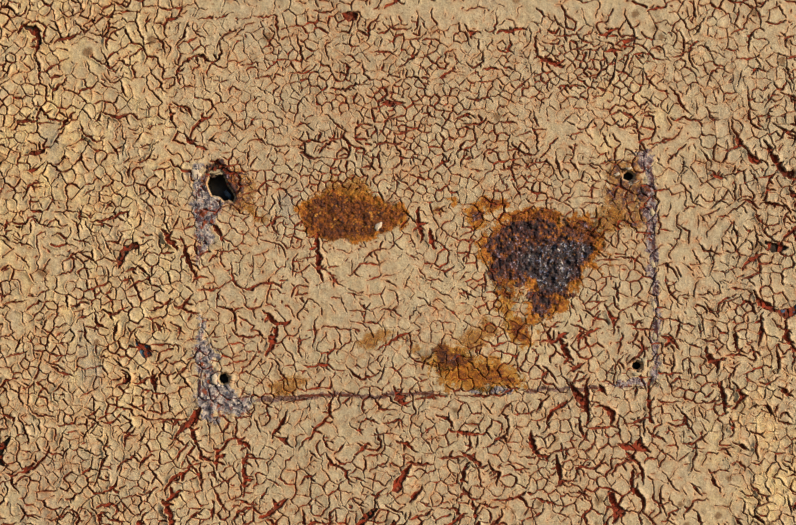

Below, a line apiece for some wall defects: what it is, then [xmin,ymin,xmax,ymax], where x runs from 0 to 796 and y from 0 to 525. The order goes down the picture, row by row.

crack [163,9,234,84]
crack [324,37,420,92]
crack [0,0,134,241]
crack [169,103,213,150]
crack [456,96,493,158]
crack [617,87,702,156]
crack [708,56,796,214]
rust [293,176,410,246]
rust [412,157,648,394]
crack [114,359,158,398]
crack [137,208,796,525]
crack [0,407,139,525]